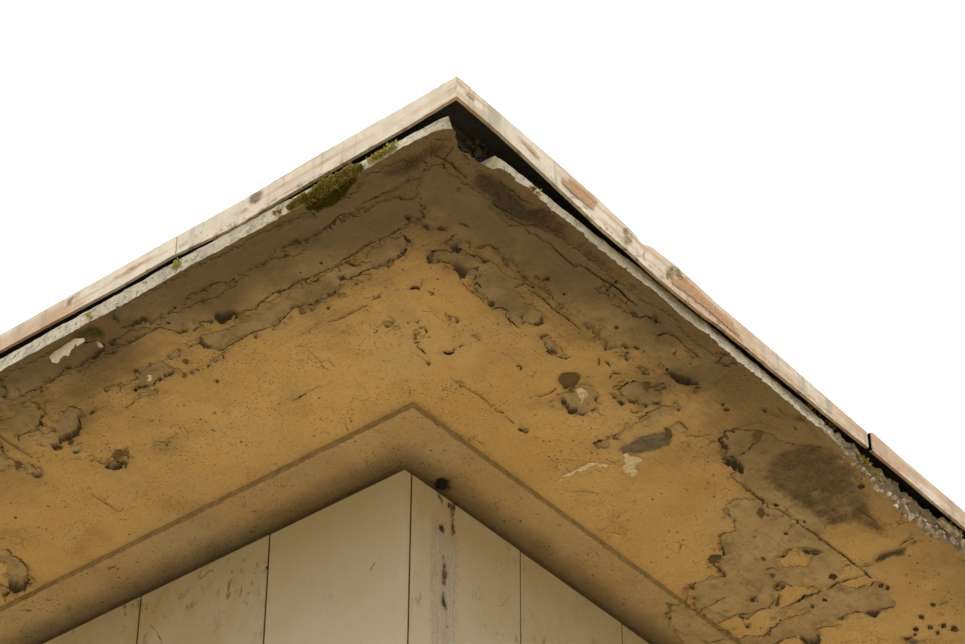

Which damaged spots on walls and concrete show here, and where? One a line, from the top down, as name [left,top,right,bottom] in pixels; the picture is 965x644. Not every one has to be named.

crack [431,139,470,179]
crack [299,296,381,336]
peeling [0,160,740,478]
crack [502,259,580,330]
leakage [768,448,879,530]
peeling [0,549,35,602]
leakage [433,479,455,644]
peeling [666,427,965,644]